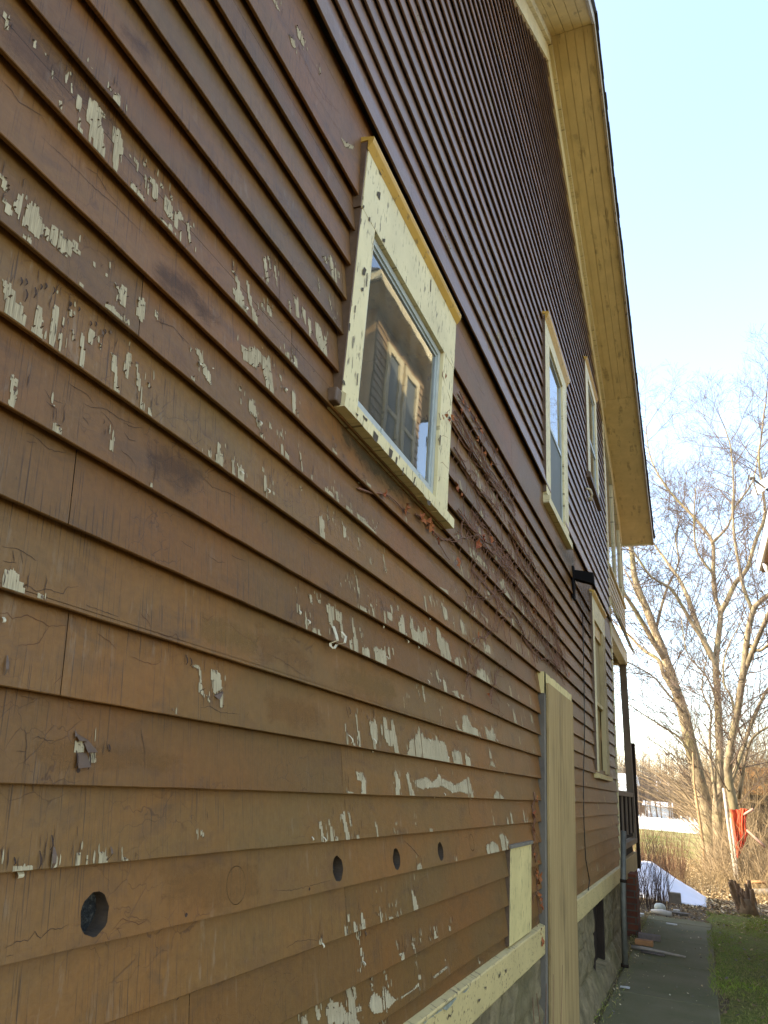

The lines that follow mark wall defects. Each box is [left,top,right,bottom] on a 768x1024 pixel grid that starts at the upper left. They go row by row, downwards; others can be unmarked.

peeling [33,40,196,252]
peeling [0,166,81,258]
peeling [2,272,154,416]
peeling [93,261,164,329]
peeling [232,261,273,325]
peeling [237,337,298,414]
peeling [263,253,332,356]
peeling [188,438,245,482]
peeling [295,441,541,798]
peeling [186,655,226,708]
peeling [486,790,528,854]
peeling [298,904,453,1024]